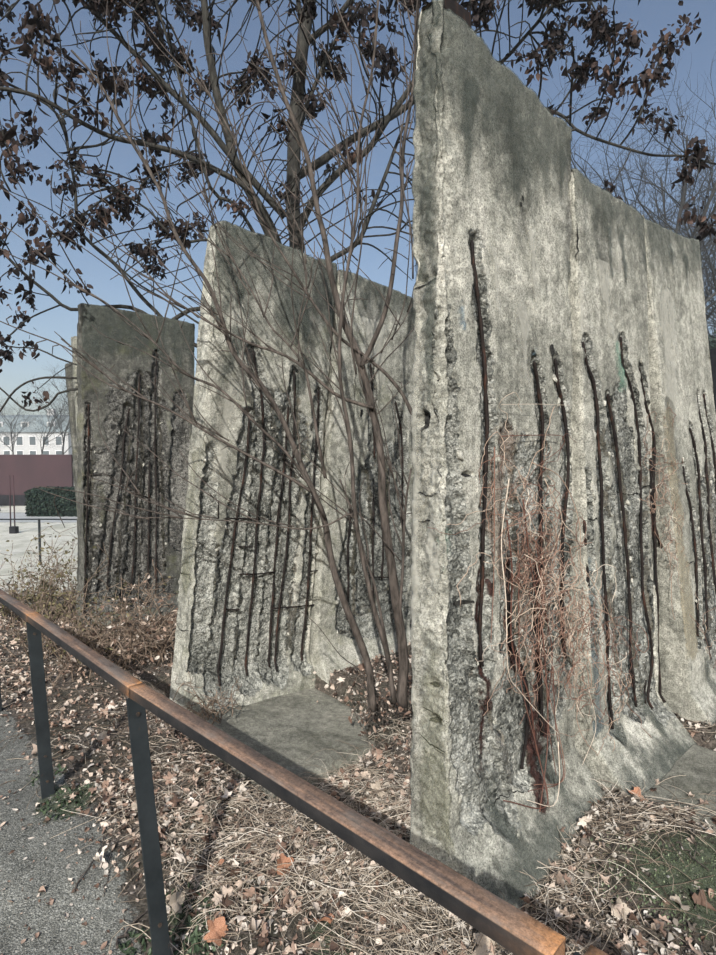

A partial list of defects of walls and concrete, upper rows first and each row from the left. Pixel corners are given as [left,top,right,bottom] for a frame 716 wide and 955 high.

spalling [83,348,190,625]
spalling [186,340,323,709]
spalling [334,359,412,640]
corrosion [475,528,495,630]
corrosion [478,662,493,754]
corrosion [503,554,517,673]
spalling [420,227,676,844]